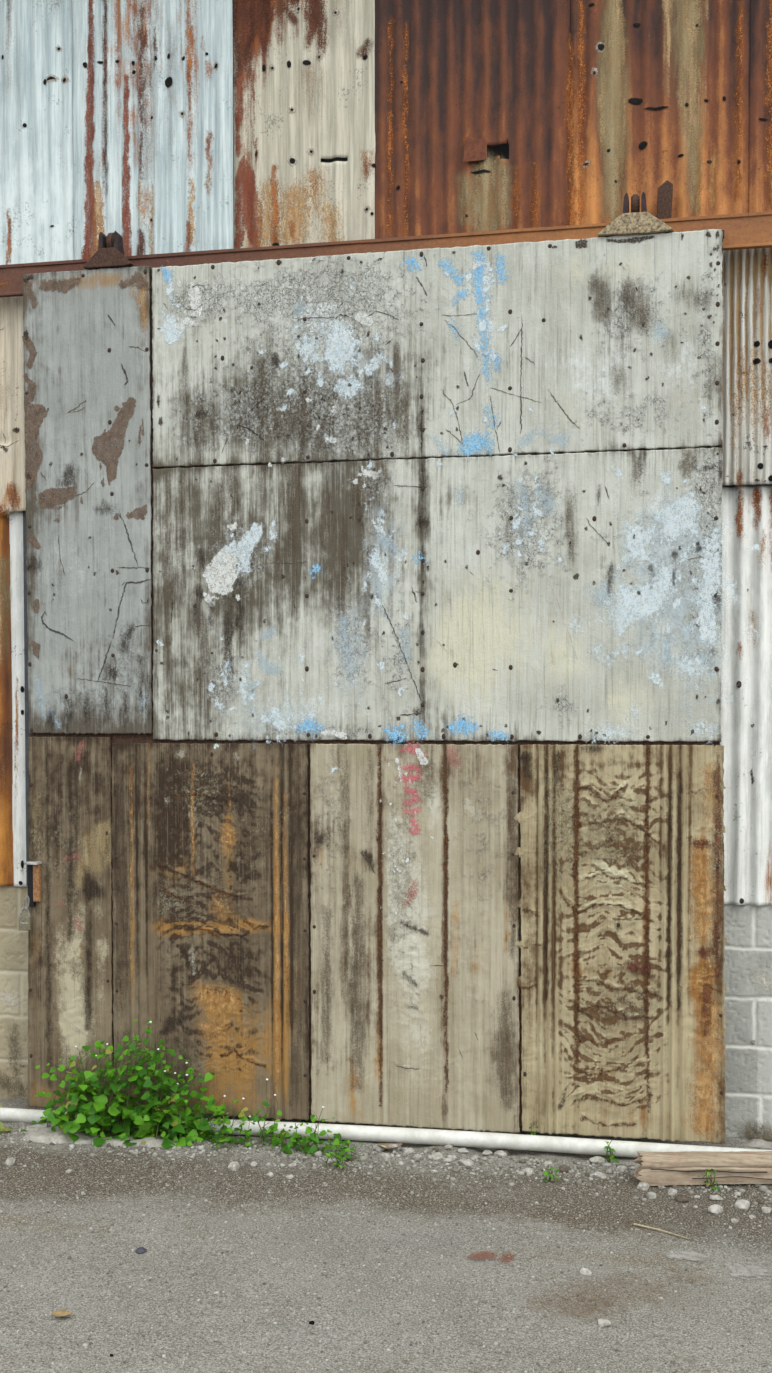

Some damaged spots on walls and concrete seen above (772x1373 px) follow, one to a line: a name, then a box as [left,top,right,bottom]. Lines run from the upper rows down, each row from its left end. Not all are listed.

rust [81,0,156,315]
rust [185,2,212,252]
rust [233,0,340,248]
rust [459,158,539,232]
rust [564,0,627,225]
peeling [157,269,210,344]
peeling [80,395,163,487]
peeling [276,311,417,448]
peeling [192,520,278,608]
peeling [329,453,408,607]
rust [735,470,772,554]
leakage [194,587,234,687]